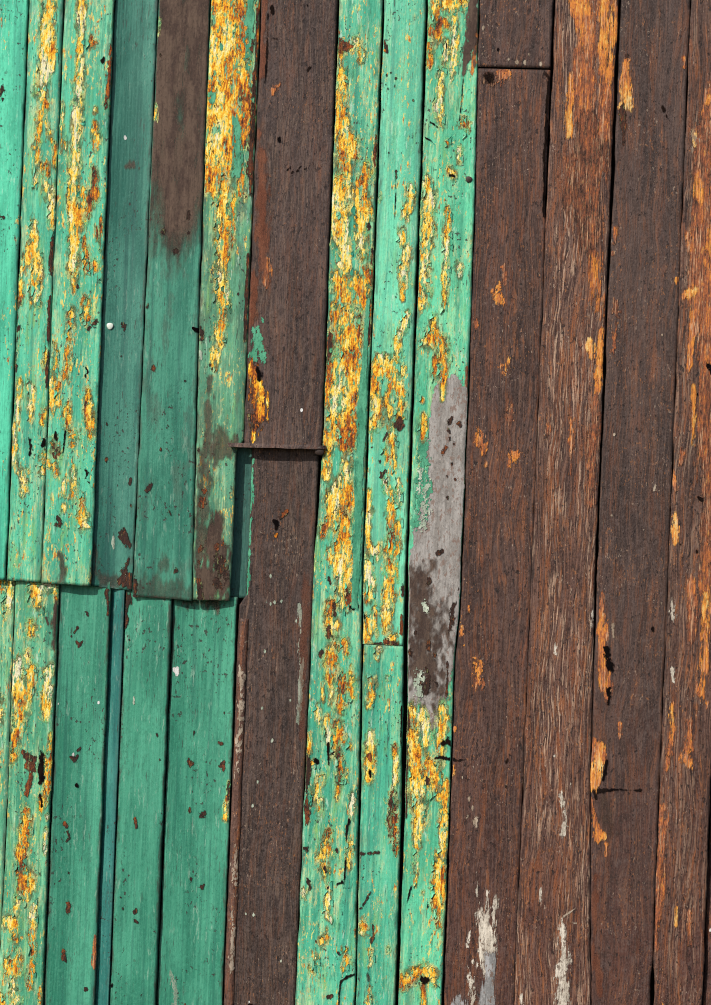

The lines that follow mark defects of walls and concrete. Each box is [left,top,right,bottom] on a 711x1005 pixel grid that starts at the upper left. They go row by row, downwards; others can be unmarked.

peeling [426,0,478,181]
peeling [12,0,103,513]
peeling [192,0,256,373]
peeling [300,35,468,935]
peeling [0,580,59,766]
peeling [0,750,49,1005]
peeling [340,945,353,973]
peeling [358,915,375,969]
peeling [363,982,373,1005]
peeling [399,960,440,993]
peeling [451,882,499,1005]
peeling [553,918,572,1005]